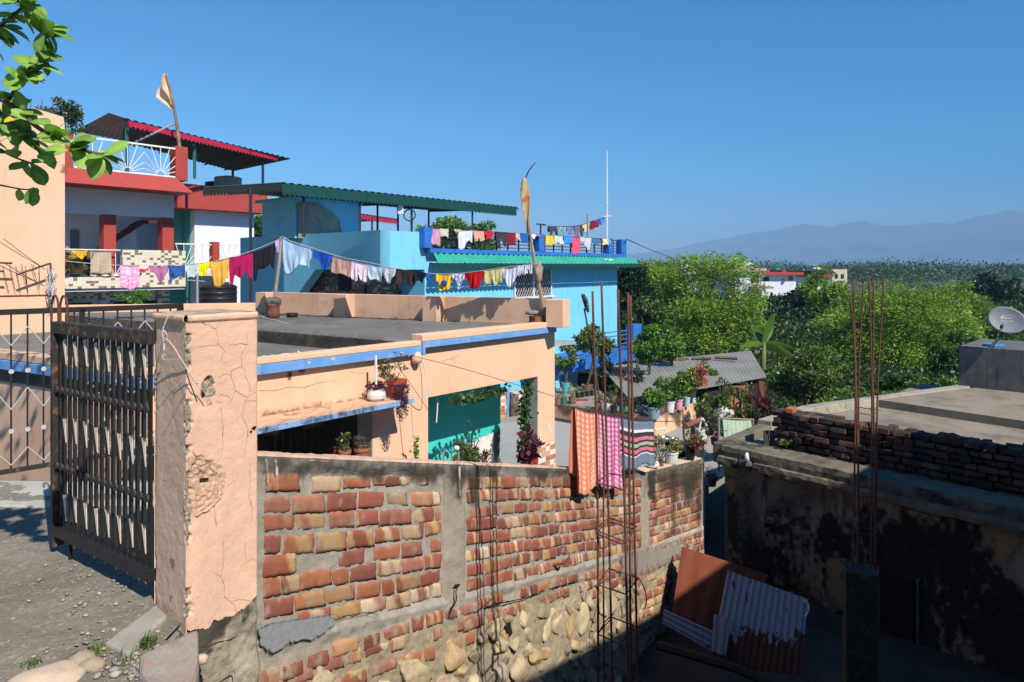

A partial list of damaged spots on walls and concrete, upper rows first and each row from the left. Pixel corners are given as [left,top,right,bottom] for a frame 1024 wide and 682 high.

spalling [184,471,192,545]
crack [170,322,377,682]